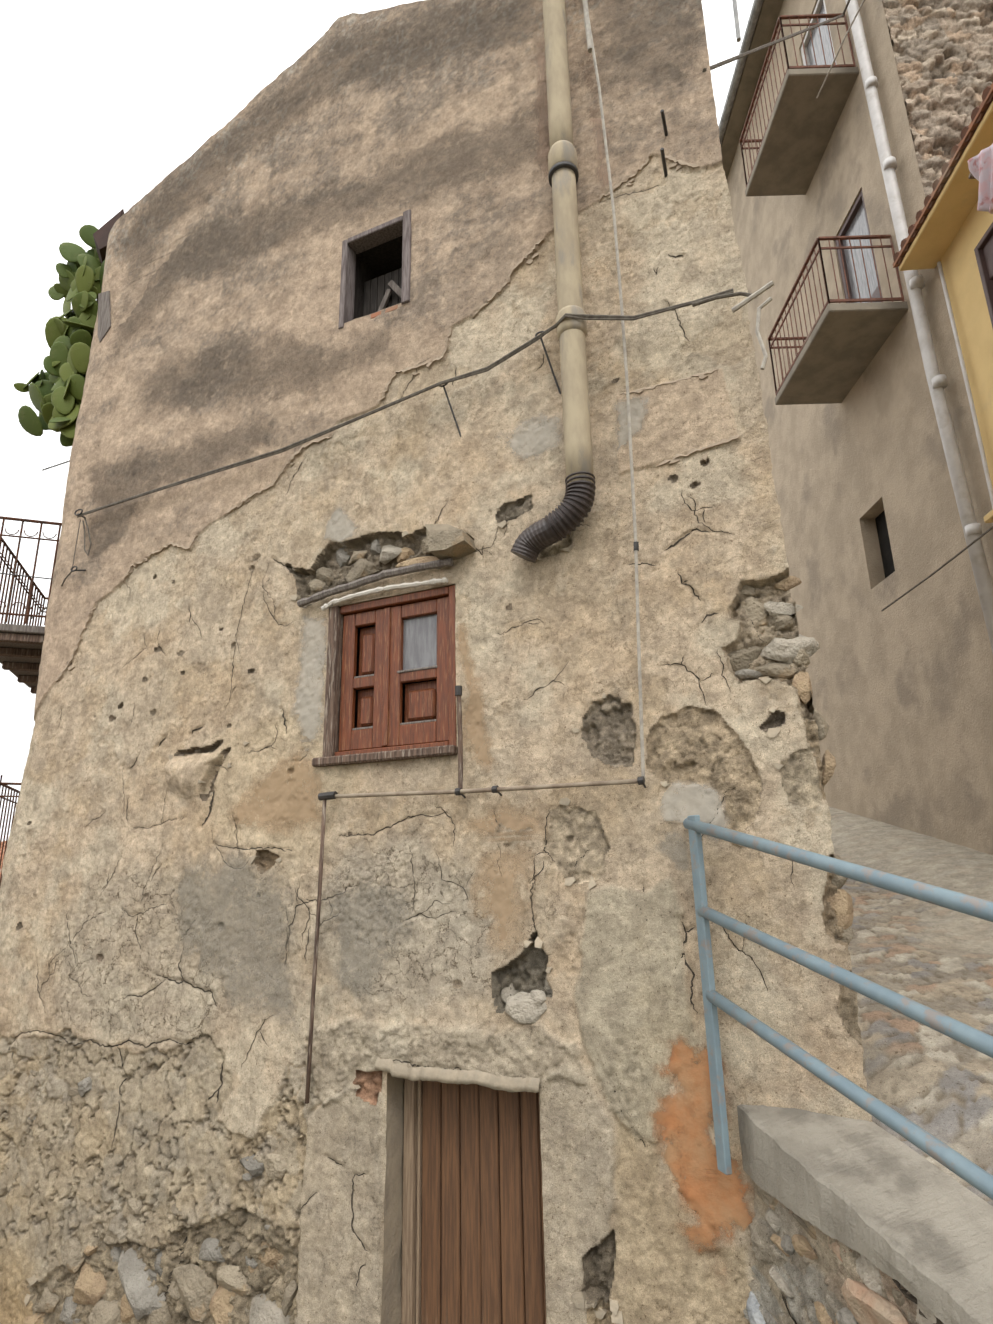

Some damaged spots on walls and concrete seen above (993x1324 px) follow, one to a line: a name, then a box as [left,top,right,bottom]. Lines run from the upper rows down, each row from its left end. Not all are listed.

spalling [495,495,533,529]
spalling [285,527,438,608]
spalling [572,567,836,846]
crack [8,559,307,1144]
spalling [544,797,611,890]
crack [285,885,352,962]
spalling [491,932,553,1025]
spalling [239,1153,287,1181]
rust [653,1039,753,1253]
spalling [23,1202,298,1324]
spalling [571,1230,624,1324]